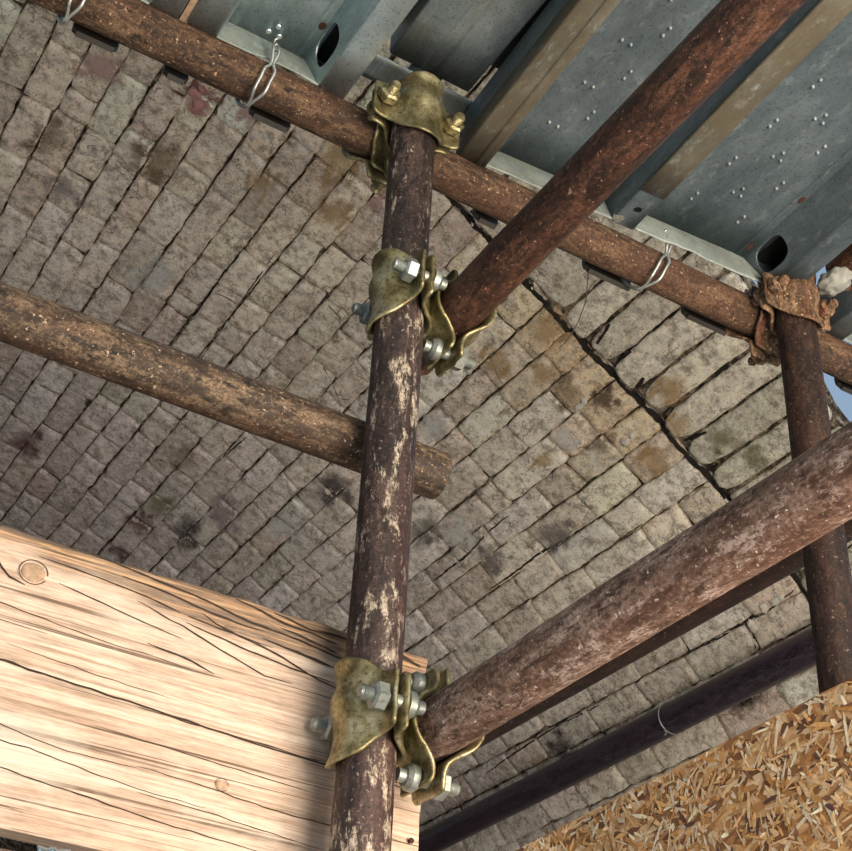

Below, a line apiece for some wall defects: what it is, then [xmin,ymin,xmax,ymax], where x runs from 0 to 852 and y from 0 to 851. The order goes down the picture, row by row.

crack [445,196,492,244]
crack [522,278,731,503]